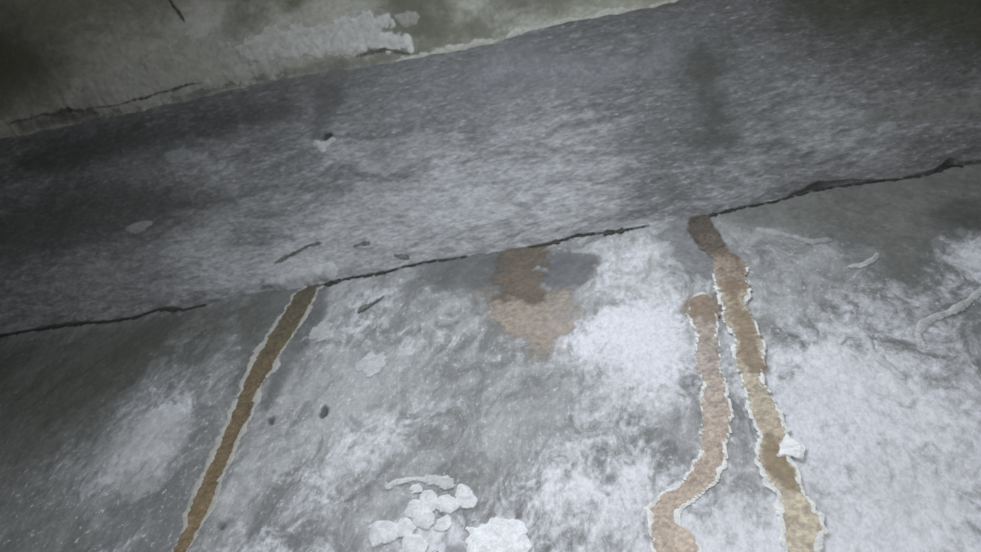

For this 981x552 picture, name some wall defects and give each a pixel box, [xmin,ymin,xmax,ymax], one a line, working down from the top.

corrosion [488,242,574,353]